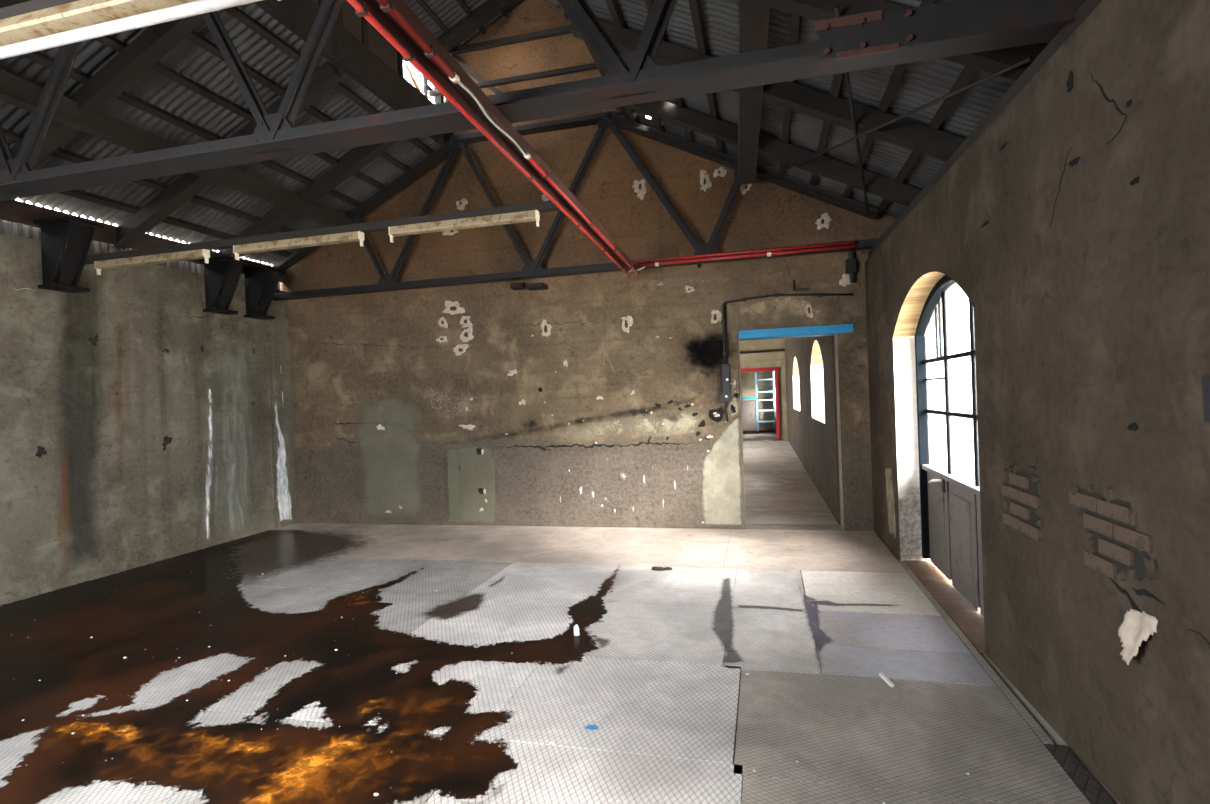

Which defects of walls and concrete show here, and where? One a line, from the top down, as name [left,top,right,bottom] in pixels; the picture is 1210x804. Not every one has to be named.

spalling [633,179,646,200]
spalling [700,167,727,192]
spalling [436,301,474,356]
crack [487,436,705,452]
peeling [568,376,742,525]
water stain [218,392,364,583]
water stain [427,578,503,619]
peeling [1118,609,1158,665]